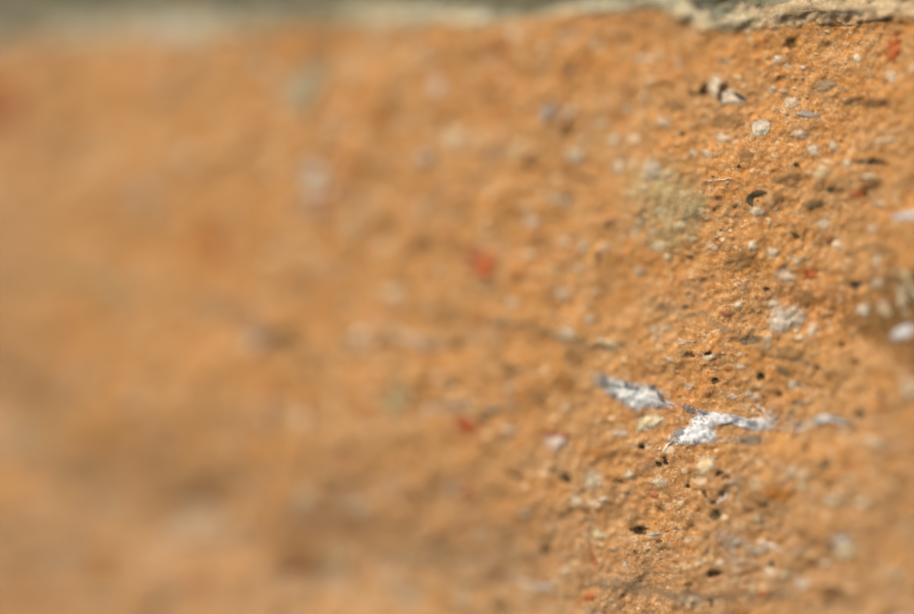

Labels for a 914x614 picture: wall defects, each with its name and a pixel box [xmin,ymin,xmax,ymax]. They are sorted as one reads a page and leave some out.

water stain [592,374,890,450]